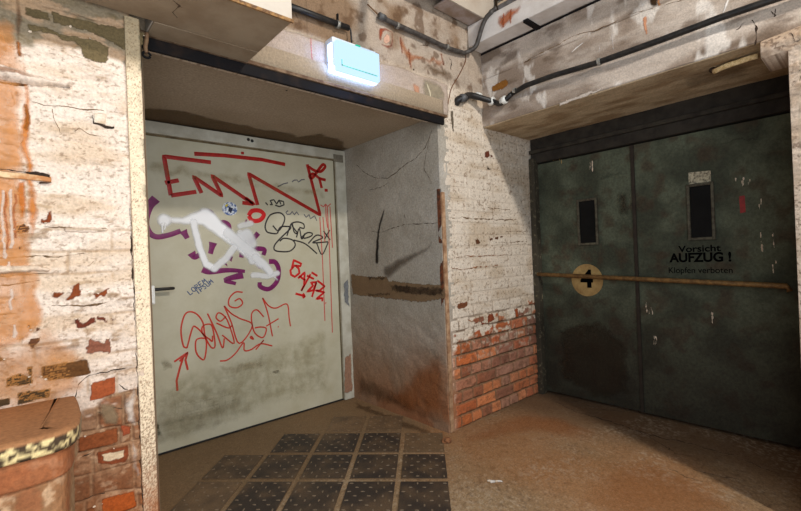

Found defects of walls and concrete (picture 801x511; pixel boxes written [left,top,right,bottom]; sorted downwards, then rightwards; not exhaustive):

crack [0,81,105,137]
peeling [52,283,81,300]
peeling [75,316,113,330]
flaking render [0,338,115,407]